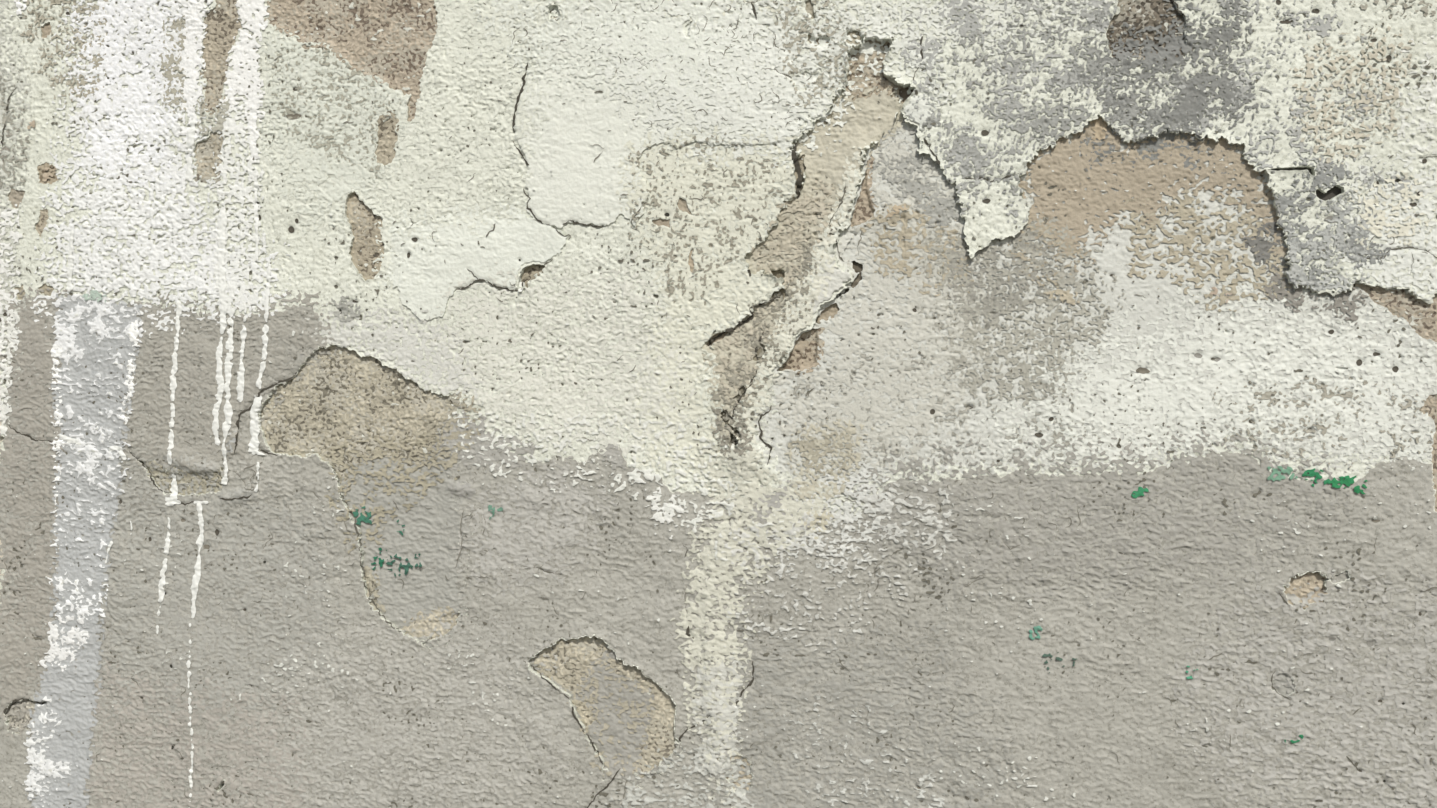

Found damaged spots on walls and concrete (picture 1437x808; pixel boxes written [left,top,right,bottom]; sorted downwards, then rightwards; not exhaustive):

flaking render [264,0,438,165]
crack [393,0,826,302]
crack [828,185,862,261]
flaking render [346,0,1437,512]
crack [924,138,1019,182]
peeling [261,345,481,648]
crack [657,219,1081,637]
flaking render [1284,570,1349,609]
flaking render [530,636,676,778]